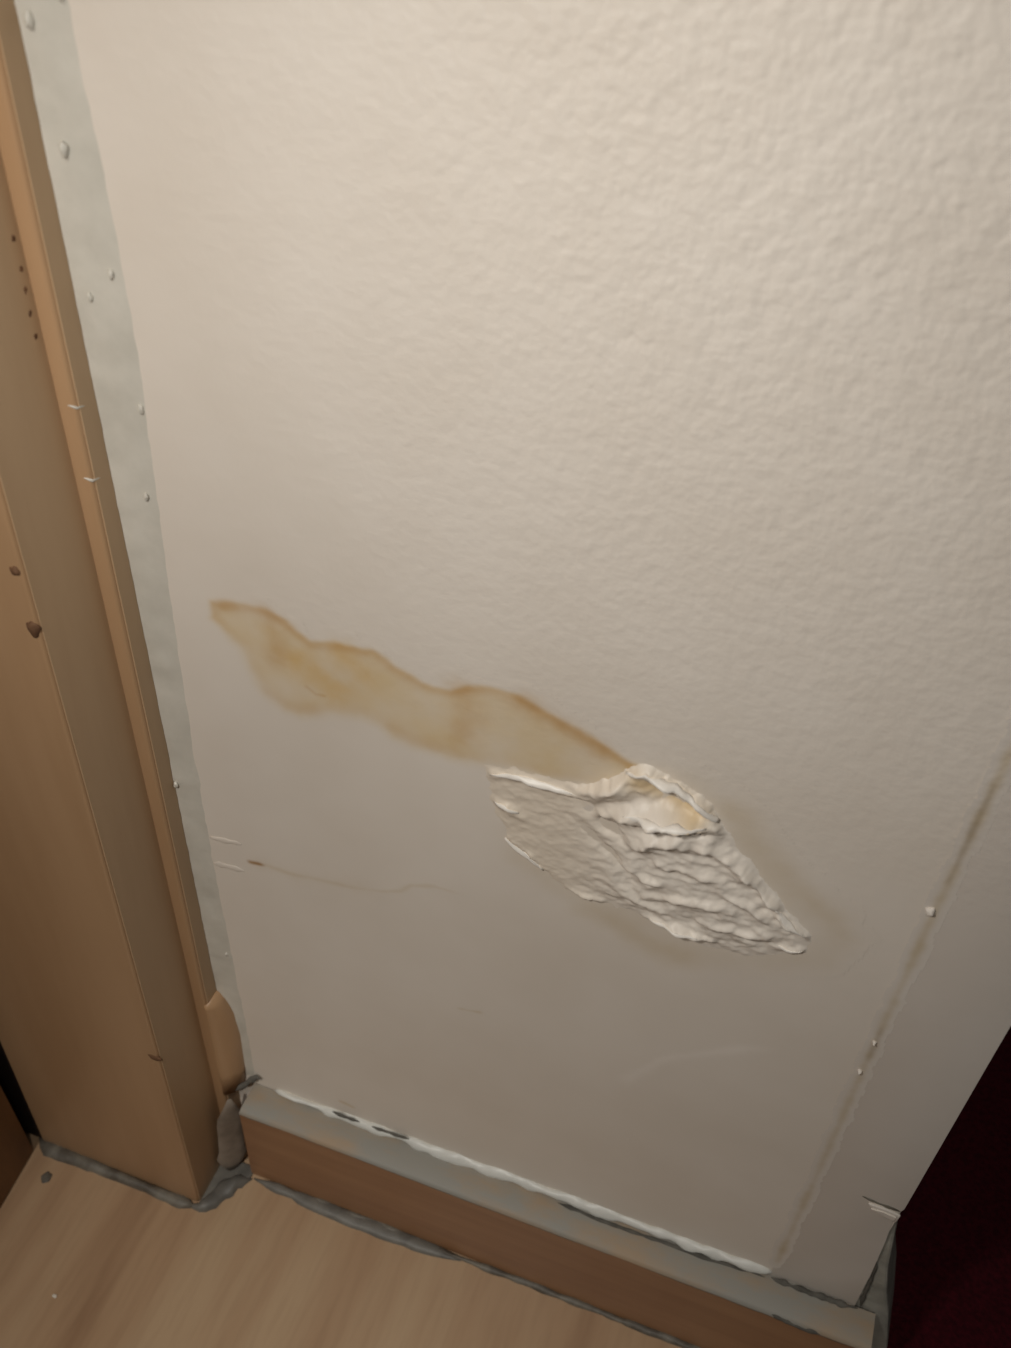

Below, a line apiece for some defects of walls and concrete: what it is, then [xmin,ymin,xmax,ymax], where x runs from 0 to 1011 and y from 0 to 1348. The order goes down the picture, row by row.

water stain [203,590,881,985]